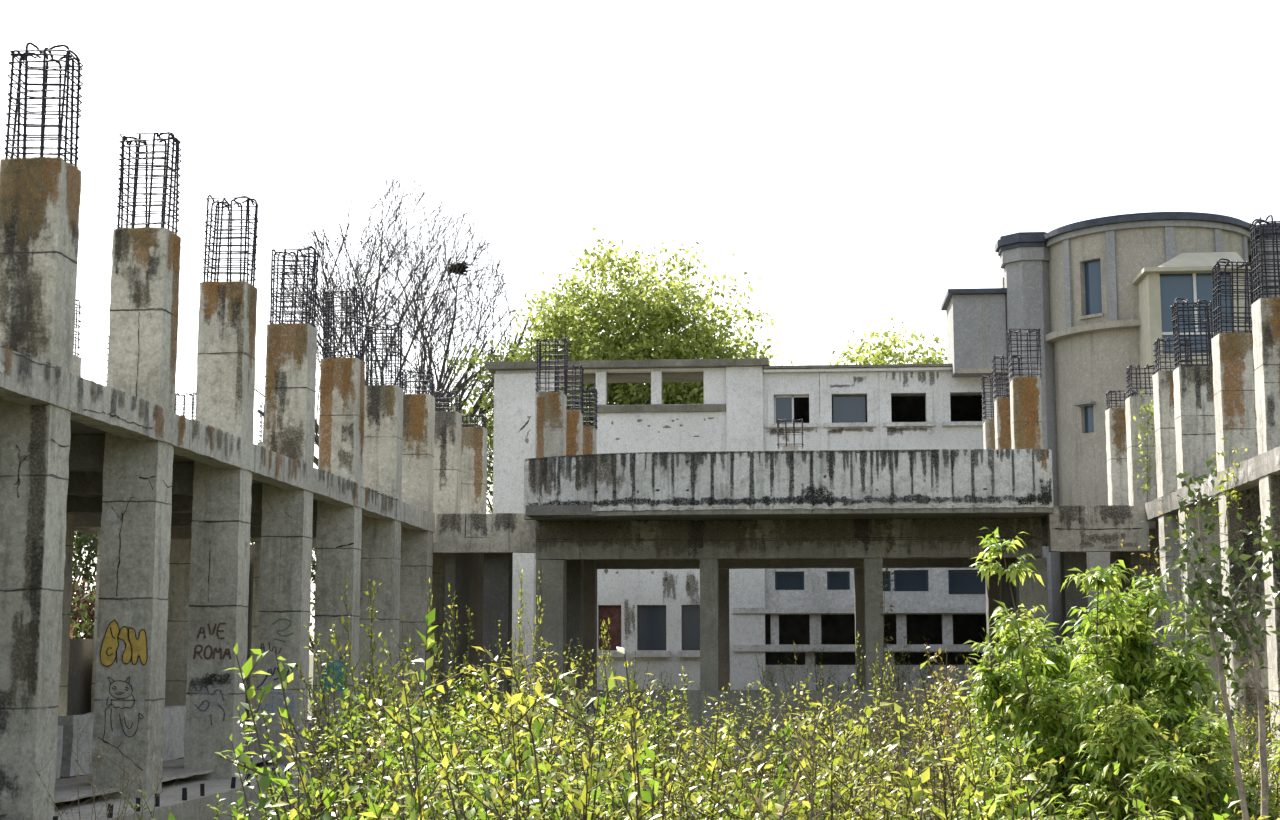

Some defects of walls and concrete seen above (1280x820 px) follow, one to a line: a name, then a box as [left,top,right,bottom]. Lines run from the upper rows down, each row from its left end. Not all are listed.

corrosion [0,156,81,258]
corrosion [116,227,181,384]
corrosion [202,281,307,447]
corrosion [319,358,365,473]
corrosion [1220,297,1280,429]
leakage [440,427,1131,554]
leakage [0,405,47,731]
leakage [624,601,635,637]
leakage [663,571,699,605]